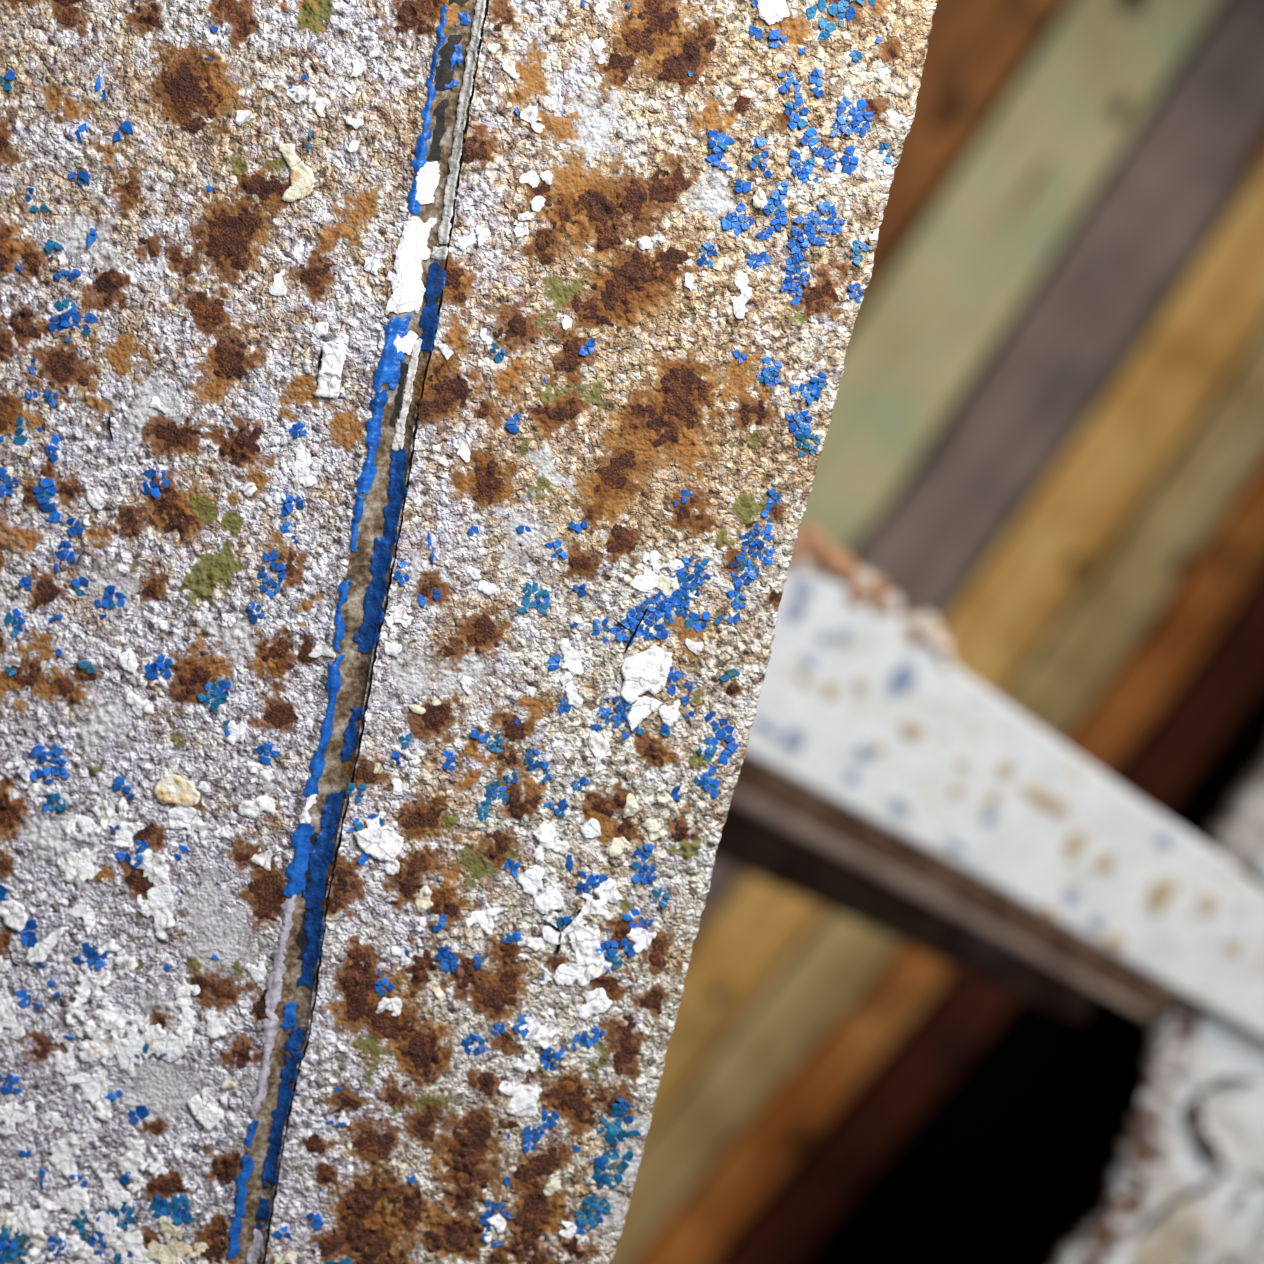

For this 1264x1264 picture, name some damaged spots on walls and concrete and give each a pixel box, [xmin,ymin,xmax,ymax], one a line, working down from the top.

corrosion [379,0,470,43]
corrosion [485,0,522,41]
peeling [514,106,545,133]
corrosion [404,41,697,438]
corrosion [76,165,291,551]
corrosion [276,366,372,451]
corrosion [450,450,518,521]
corrosion [564,349,777,578]
crack [263,0,489,1264]
corrosion [0,777,32,878]
corrosion [302,692,686,1264]
peeling [544,1177,561,1196]